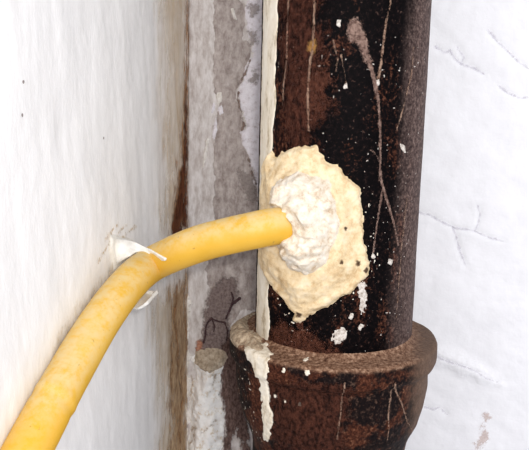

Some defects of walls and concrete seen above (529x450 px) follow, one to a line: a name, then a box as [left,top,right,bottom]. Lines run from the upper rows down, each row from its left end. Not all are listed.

leakage [165,0,185,229]
peeling [202,0,262,220]
rust [277,0,332,151]
leakage [157,298,180,450]
peeling [186,327,205,368]
peeling [205,249,257,328]
rust [268,318,341,354]
rust [269,379,352,450]